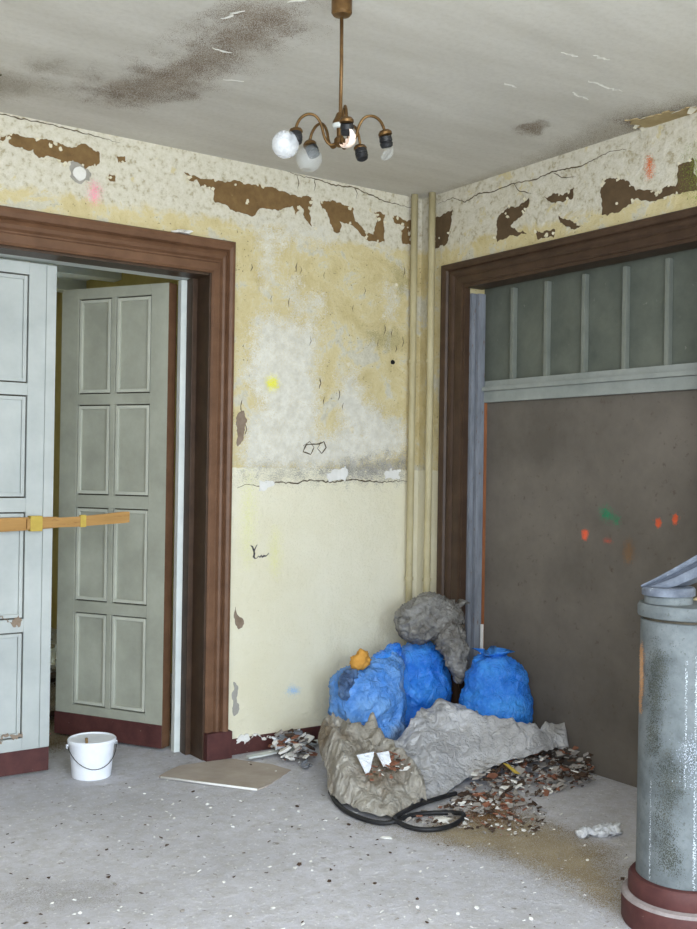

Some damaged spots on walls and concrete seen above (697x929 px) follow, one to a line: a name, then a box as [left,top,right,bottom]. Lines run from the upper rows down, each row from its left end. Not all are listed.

leakage [0,0,336,113]
spalling [608,101,697,132]
peeling [0,133,100,169]
peeling [106,156,126,182]
peeling [184,172,411,245]
peeling [435,209,453,249]
crack [440,149,626,203]
peeling [493,197,580,242]
peeling [545,188,574,203]
peeling [600,158,697,216]
flaking render [233,264,417,491]